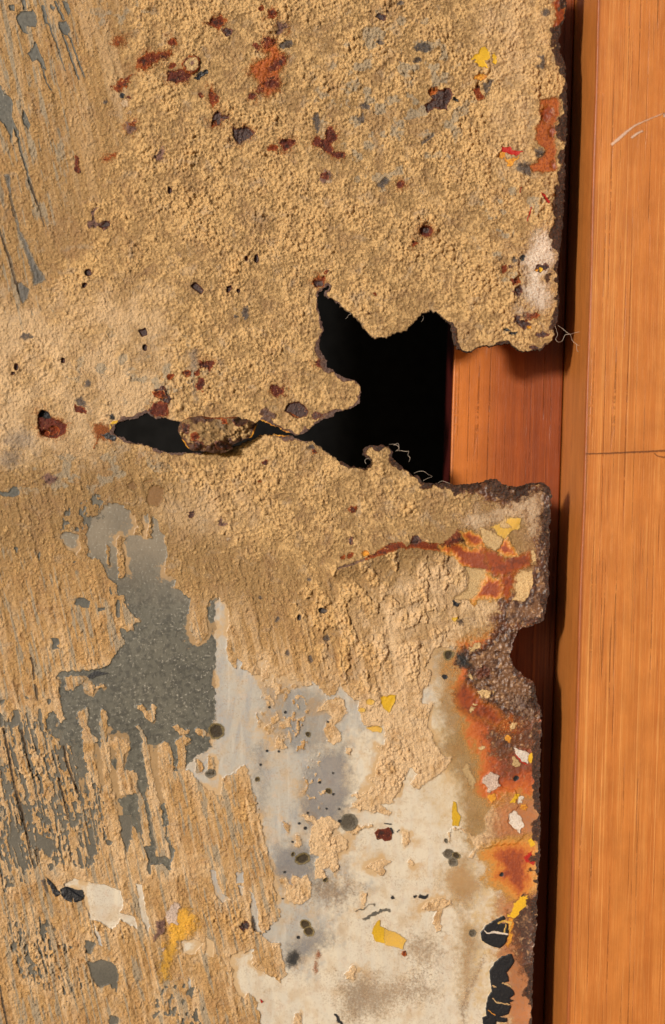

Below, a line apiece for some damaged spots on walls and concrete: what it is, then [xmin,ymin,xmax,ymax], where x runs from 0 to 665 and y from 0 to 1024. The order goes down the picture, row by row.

corrosion [110,38,255,145]
corrosion [247,5,290,100]
corrosion [312,126,345,159]
corrosion [530,0,568,330]
peeling [46,493,528,1024]
corrosion [339,444,553,1024]
peeling [505,723,533,781]
peeling [509,794,535,865]